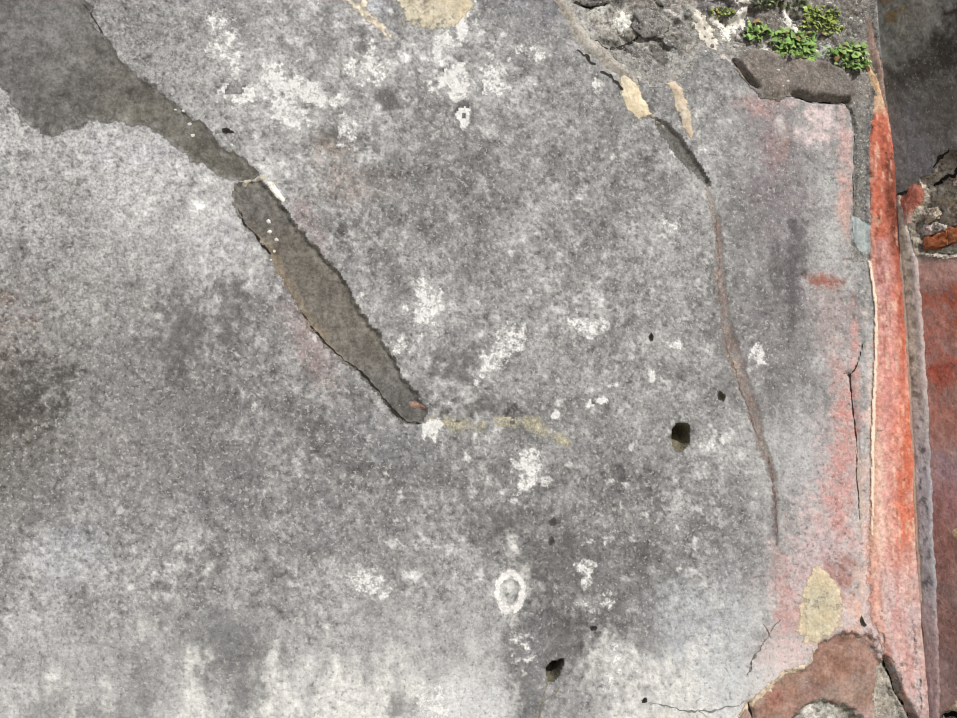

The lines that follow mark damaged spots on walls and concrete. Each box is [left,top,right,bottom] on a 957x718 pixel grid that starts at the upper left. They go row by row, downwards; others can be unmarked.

spalling [900,148,957,259]
crack [707,188,778,543]
crack [844,344,863,518]
crack [661,507,734,536]
crack [747,620,780,675]
spalling [738,563,917,718]
crack [650,700,753,718]